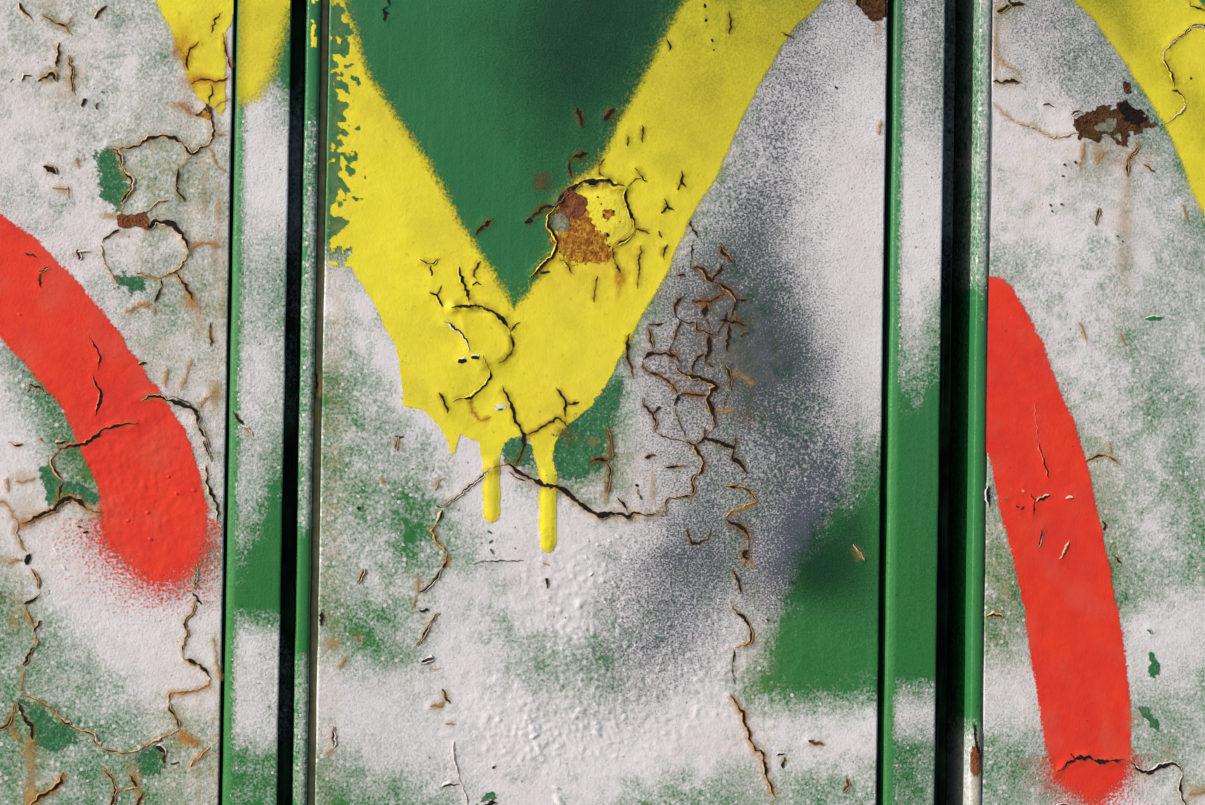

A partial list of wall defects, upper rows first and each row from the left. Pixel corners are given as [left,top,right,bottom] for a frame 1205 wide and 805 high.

crack [0,2,253,691]
crack [413,108,776,804]
crack [30,772,64,805]
crack [102,564,221,805]
crack [1057,753,1204,805]